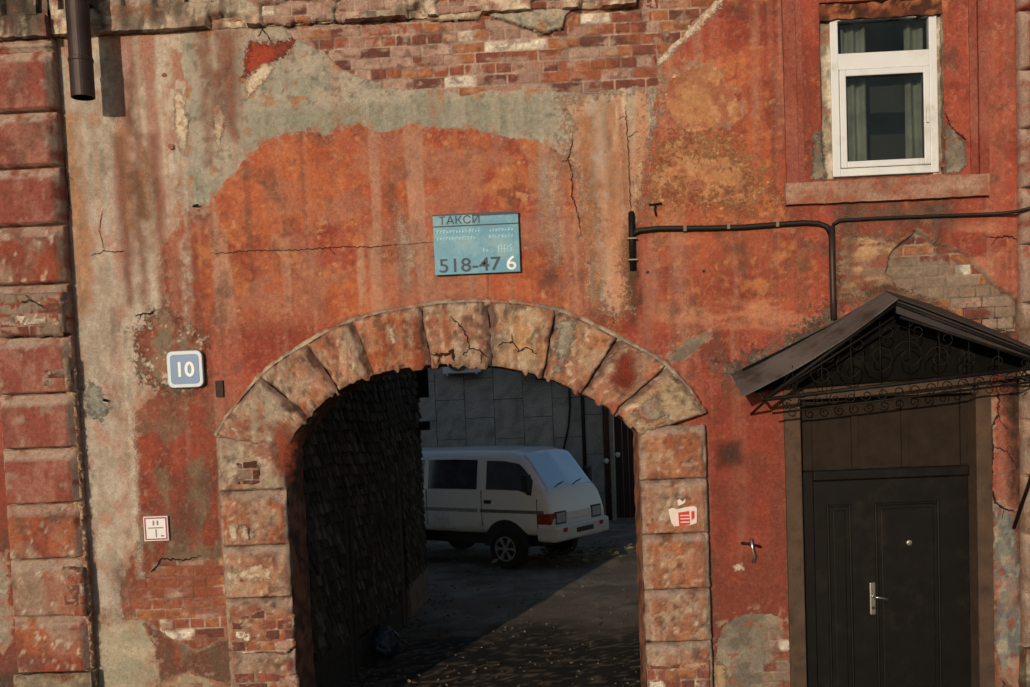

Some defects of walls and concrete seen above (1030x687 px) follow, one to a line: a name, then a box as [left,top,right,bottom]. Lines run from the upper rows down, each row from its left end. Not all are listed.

crack [562,140,581,231]
peeling [941,125,967,175]
peeling [0,0,790,687]
crack [431,318,536,364]
flaking render [699,221,1016,387]
peeling [993,500,1021,687]